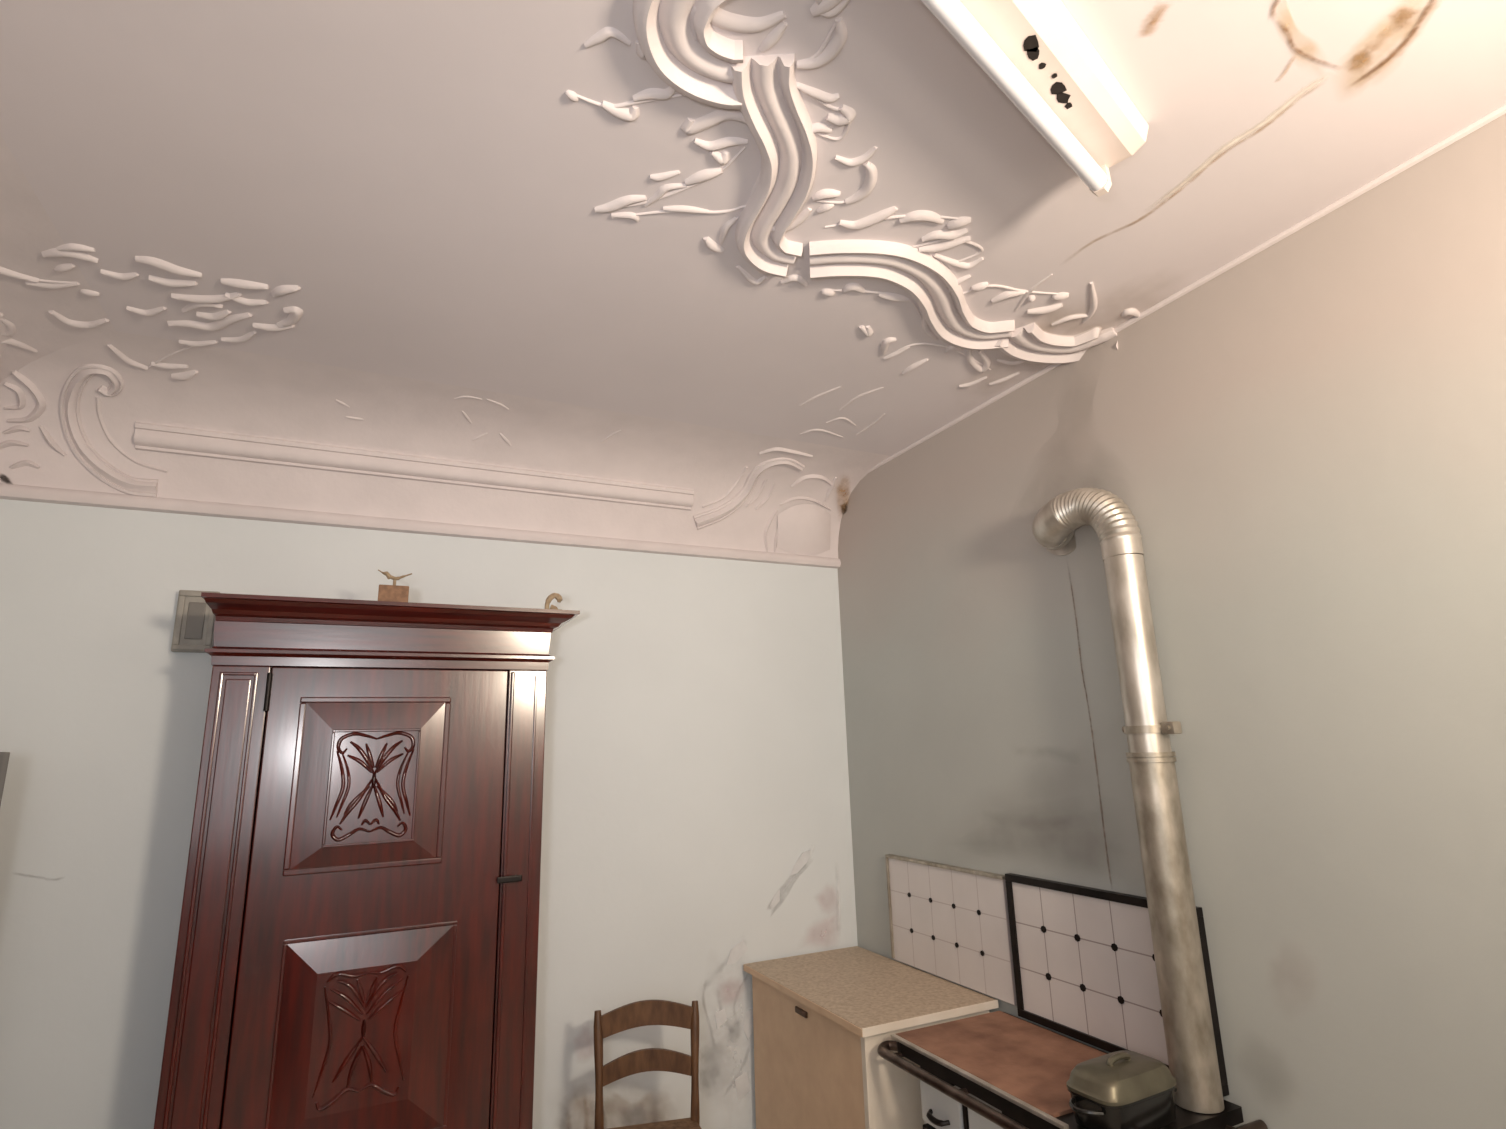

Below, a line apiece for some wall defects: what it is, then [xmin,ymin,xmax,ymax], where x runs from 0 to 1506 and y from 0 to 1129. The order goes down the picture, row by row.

crack [1272,0,1315,60]
crack [1362,0,1434,72]